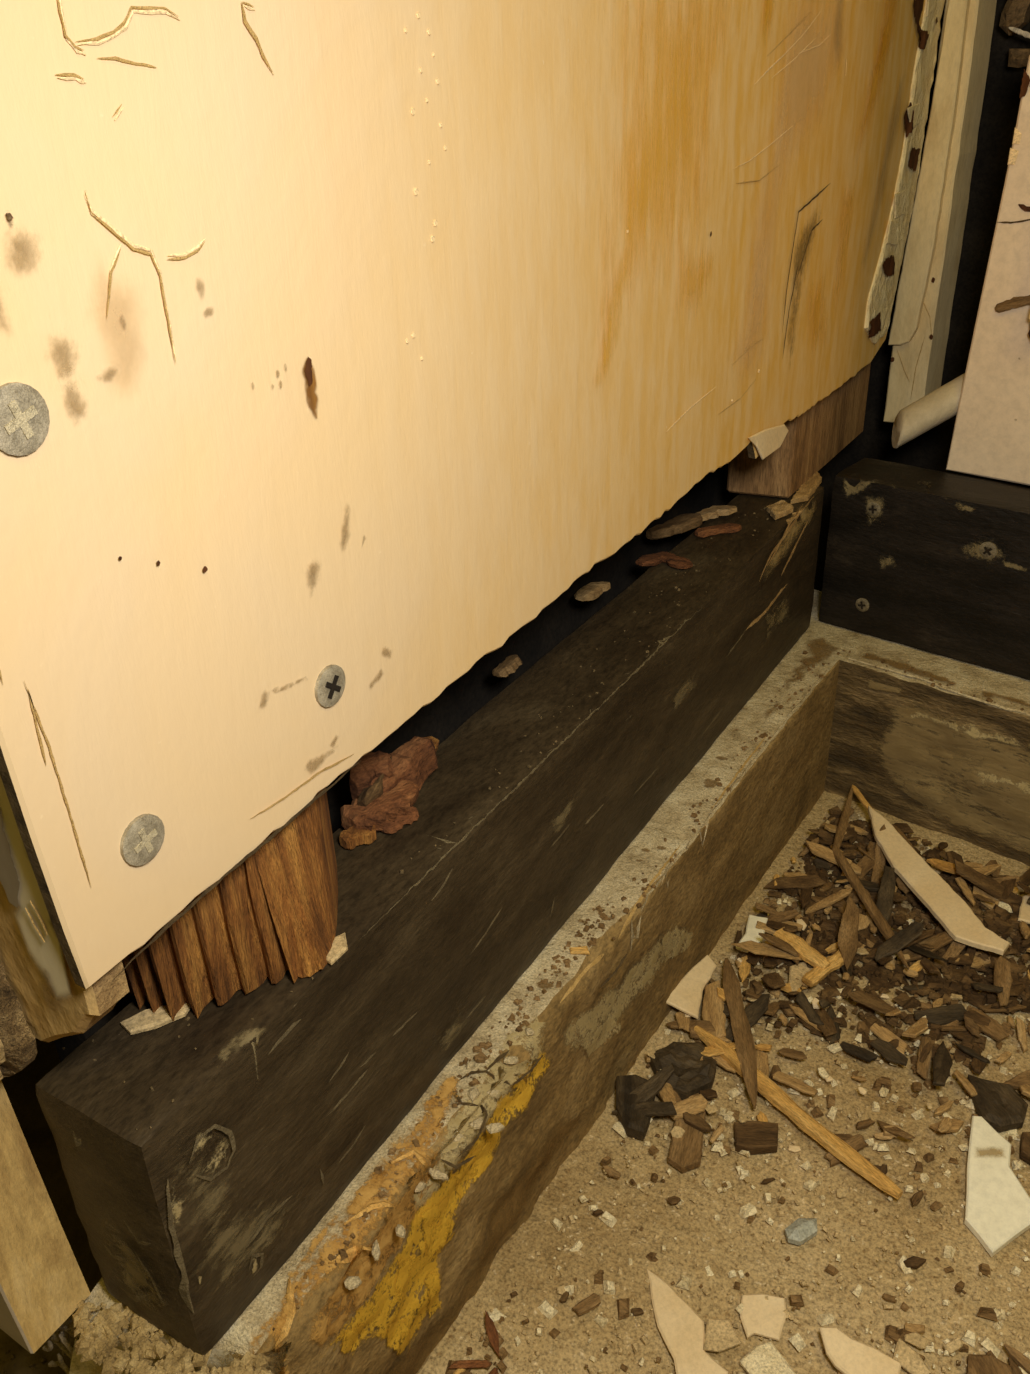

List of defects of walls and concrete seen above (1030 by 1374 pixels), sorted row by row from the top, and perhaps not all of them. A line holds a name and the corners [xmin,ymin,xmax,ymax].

peeling [0,776,70,1008]
spalling [415,1017,545,1193]
crack [441,1050,543,1169]
spalling [344,1276,362,1290]
spalling [371,1239,381,1260]
spalling [396,1224,406,1238]